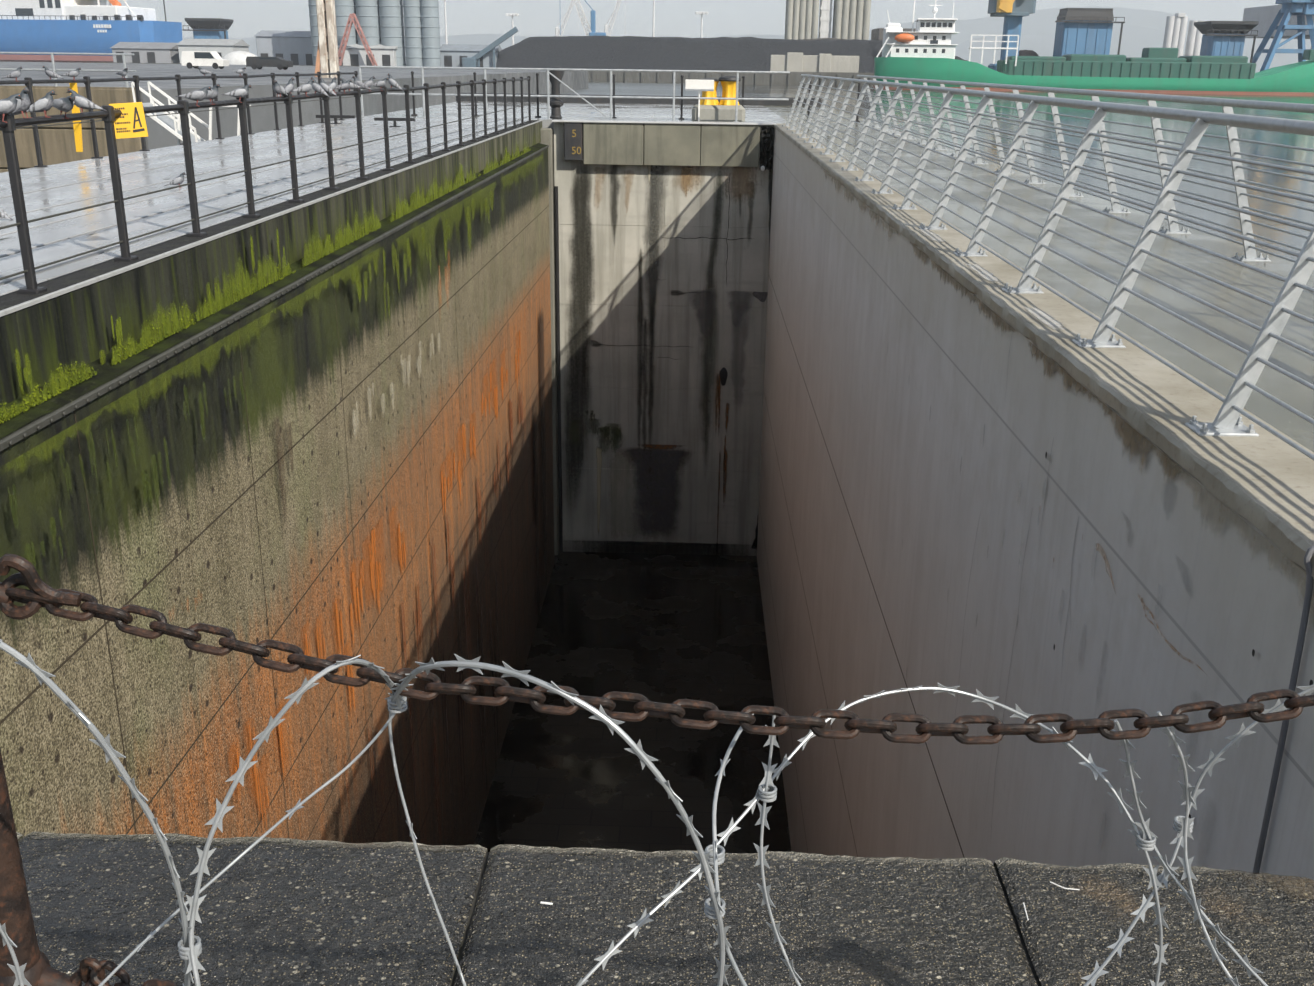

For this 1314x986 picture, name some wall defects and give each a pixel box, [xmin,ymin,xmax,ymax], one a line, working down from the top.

water stain [740,170,773,252]
water stain [250,236,262,287]
water stain [351,221,451,319]
water stain [15,349,33,393]
water stain [99,315,123,365]
water stain [565,165,759,556]
water stain [60,416,171,511]
corrosion [441,331,523,548]
water stain [533,308,547,624]
corrosion [305,529,382,708]
corrosion [235,724,269,830]